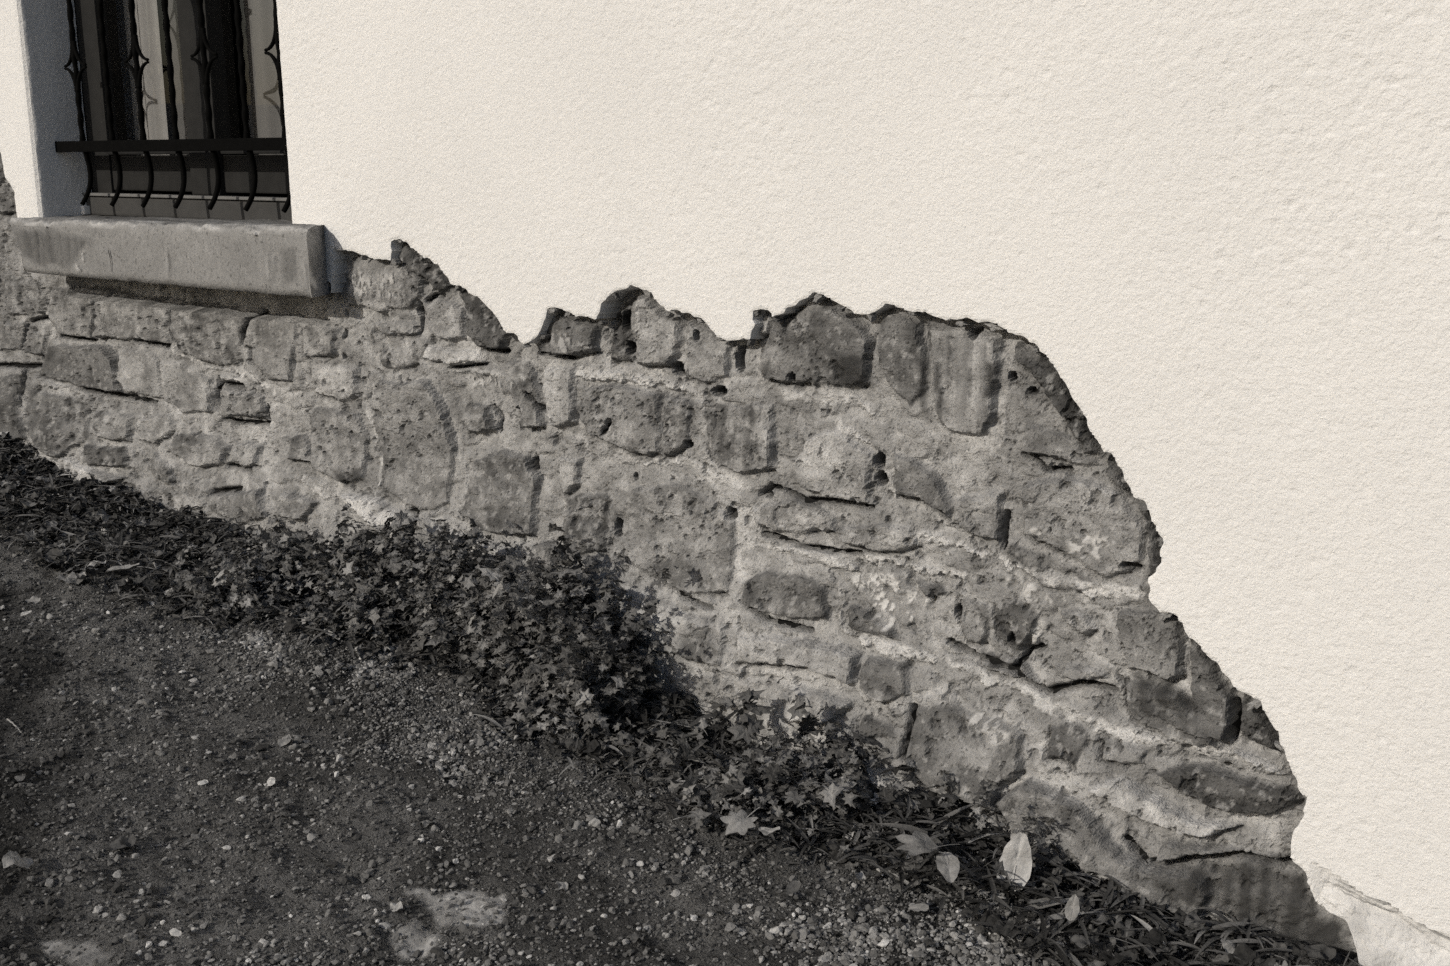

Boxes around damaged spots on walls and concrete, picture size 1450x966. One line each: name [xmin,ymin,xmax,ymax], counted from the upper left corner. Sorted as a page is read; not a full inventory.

spalling [0,152,1357,953]